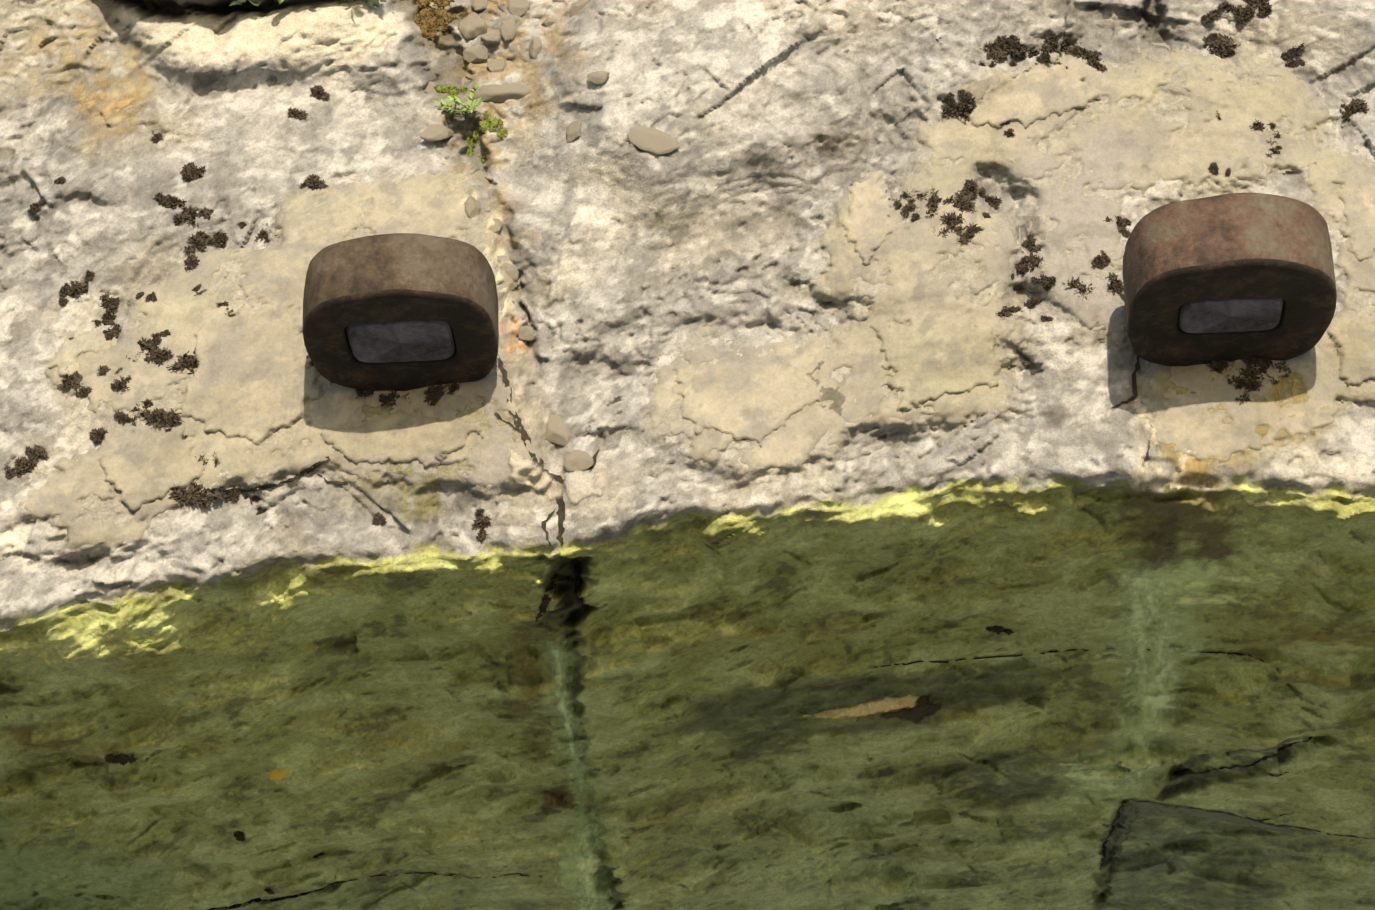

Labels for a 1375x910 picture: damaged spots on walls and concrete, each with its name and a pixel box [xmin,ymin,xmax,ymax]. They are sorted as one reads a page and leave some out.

crack [482,357,599,622]
damp [1058,407,1278,798]
damp [1254,373,1306,408]
crack [206,872,542,910]
damp [547,641,614,910]
crack [1100,736,1375,869]